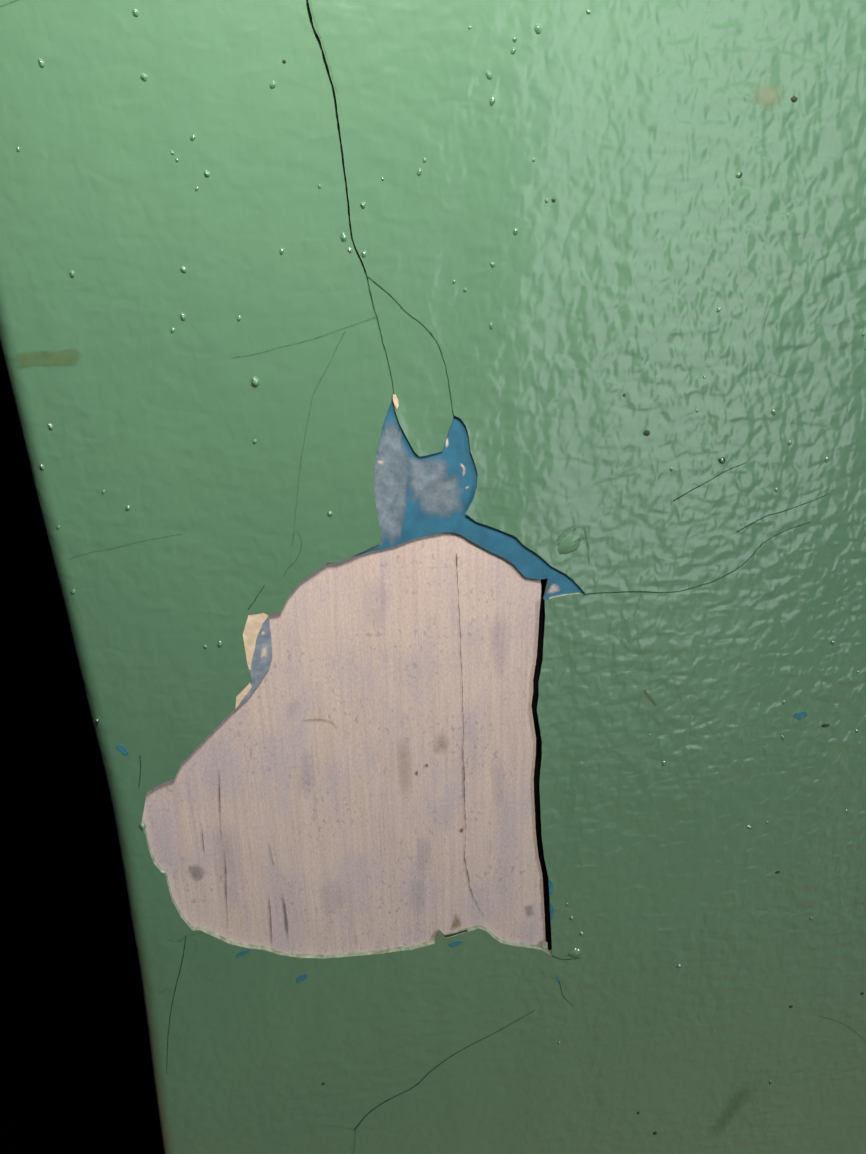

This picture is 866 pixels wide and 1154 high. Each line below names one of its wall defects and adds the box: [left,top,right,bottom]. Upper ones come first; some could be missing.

crack [233,0,454,610]
crack [583,493,830,595]
crack [673,462,747,501]
peeling [142,394,585,958]
crack [332,1010,535,1154]